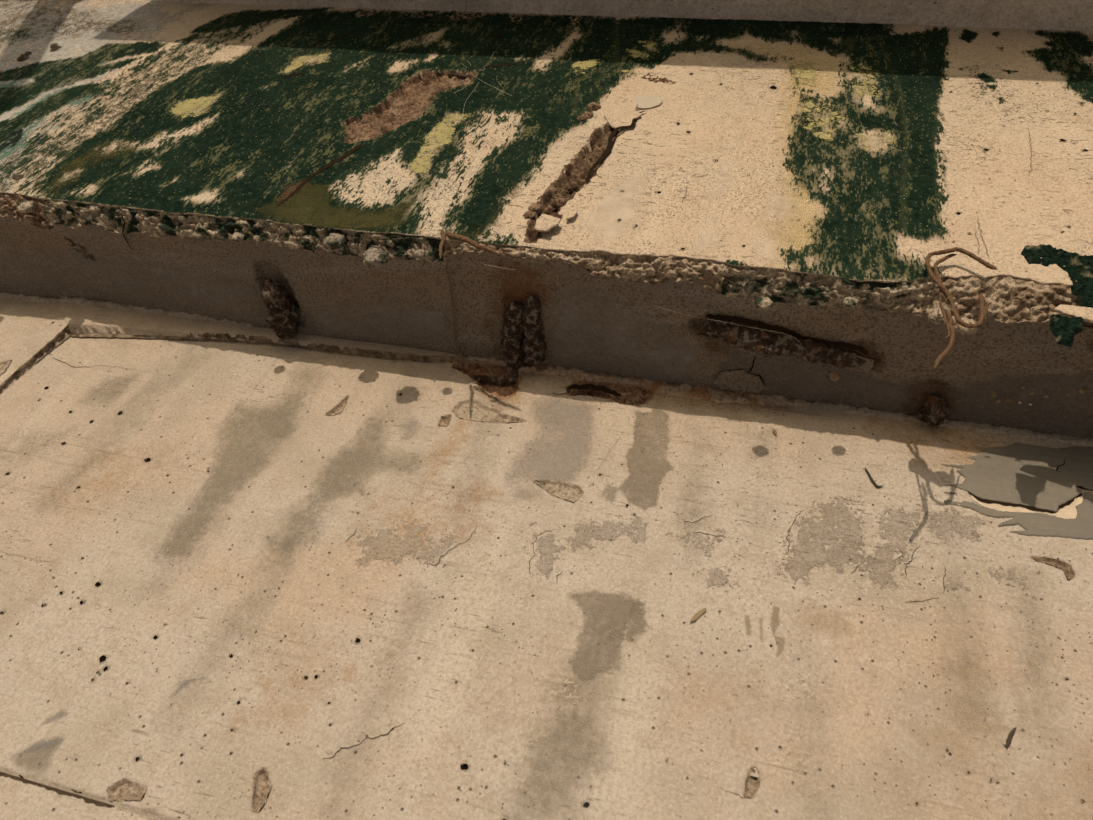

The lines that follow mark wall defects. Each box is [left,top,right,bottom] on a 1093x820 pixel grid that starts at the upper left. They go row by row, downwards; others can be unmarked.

rust [260,278,302,338]
rust [500,295,547,370]
spalling [0,193,1093,335]
rust [700,314,884,372]
water stain [166,411,292,553]
spalling [533,479,583,502]
water stain [622,408,671,509]
water stain [569,593,646,688]